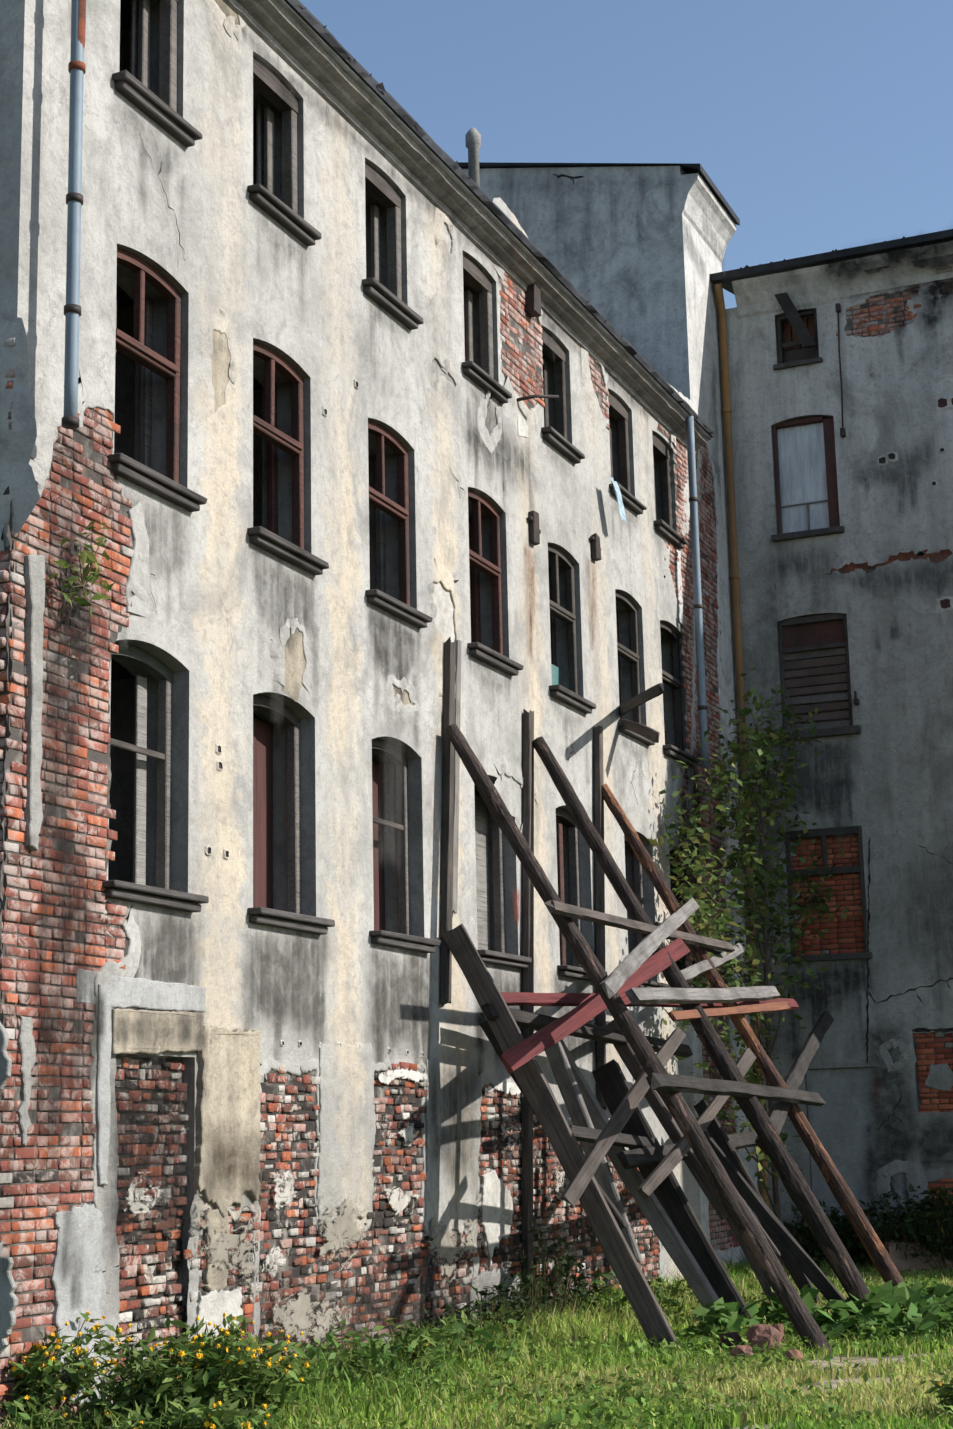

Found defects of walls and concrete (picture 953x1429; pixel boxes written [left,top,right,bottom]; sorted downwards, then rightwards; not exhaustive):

flaking render [493,198,528,238]
flaking render [421,262,545,458]
flaking render [669,384,702,418]
flaking render [824,239,953,360]
flaking render [657,423,733,988]
flaking render [0,304,624,1429]
crack [865,838,953,1064]
flaking render [693,1028,743,1161]
flaking render [703,1008,736,1063]
flaking render [605,1154,663,1285]
flaking render [700,1187,747,1269]